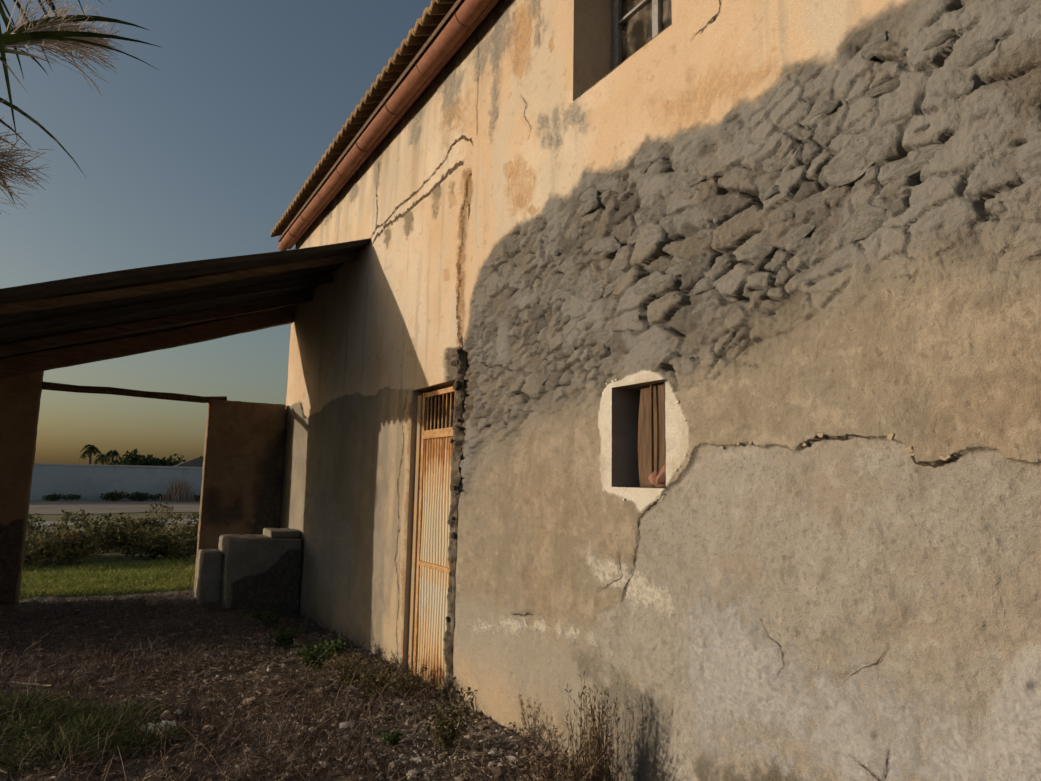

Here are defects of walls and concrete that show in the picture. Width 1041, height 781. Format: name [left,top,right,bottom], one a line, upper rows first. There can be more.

crack [693,0,721,38]
crack [371,34,480,352]
crack [602,496,662,600]
spalling [584,433,1041,781]
crack [854,752,889,781]